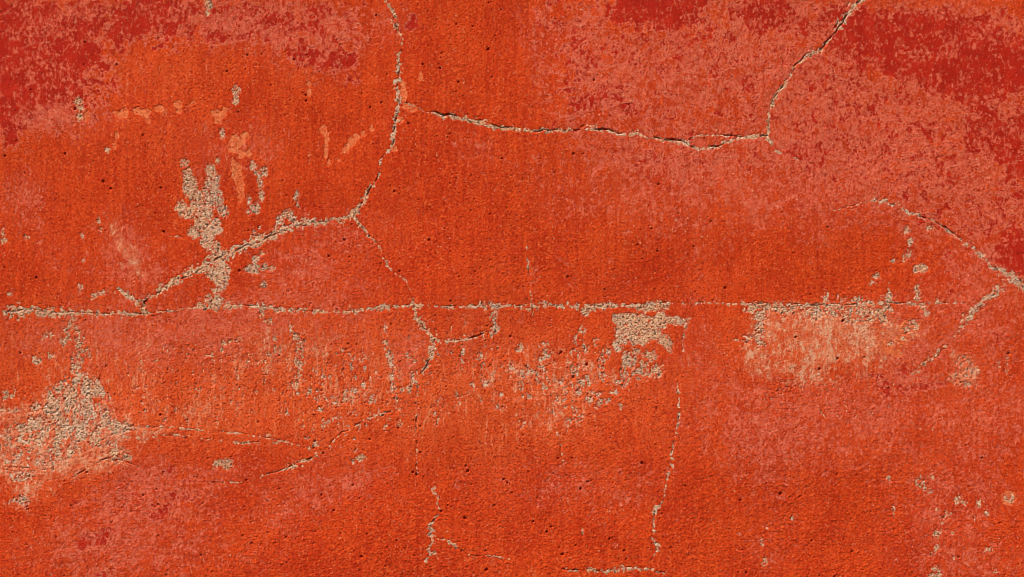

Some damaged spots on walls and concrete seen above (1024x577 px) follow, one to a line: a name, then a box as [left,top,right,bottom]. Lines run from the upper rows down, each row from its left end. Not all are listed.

flaking render [174,84,301,308]
peeling [0,299,692,518]
crack [2,0,1024,437]
crack [565,383,681,575]
peeling [717,225,941,425]